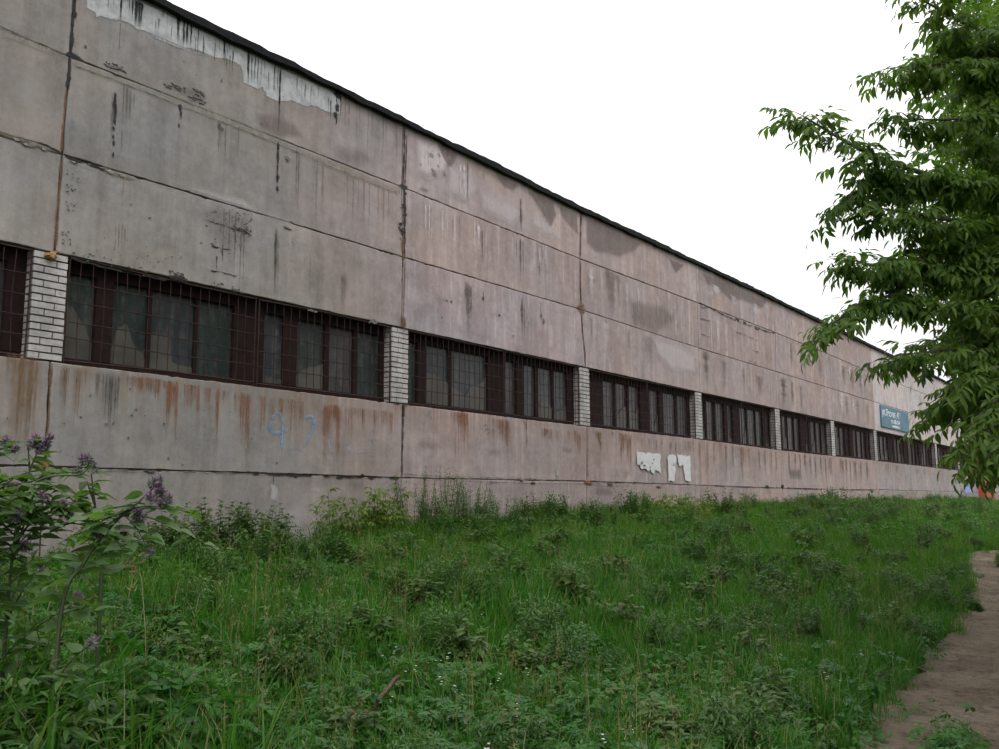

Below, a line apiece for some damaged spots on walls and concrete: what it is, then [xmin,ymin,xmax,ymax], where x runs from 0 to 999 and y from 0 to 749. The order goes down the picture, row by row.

peeling [86,0,342,114]
damp [112,93,131,157]
damp [400,129,473,254]
damp [580,214,636,304]